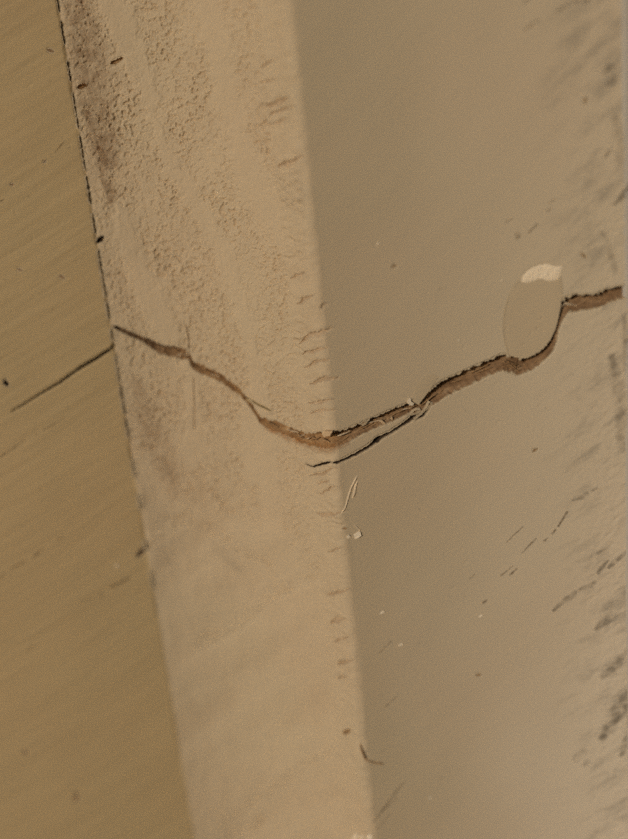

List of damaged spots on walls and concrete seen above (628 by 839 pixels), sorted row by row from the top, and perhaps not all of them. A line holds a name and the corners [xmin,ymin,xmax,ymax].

crack [10,0,627,518]
peeling [502,262,565,358]